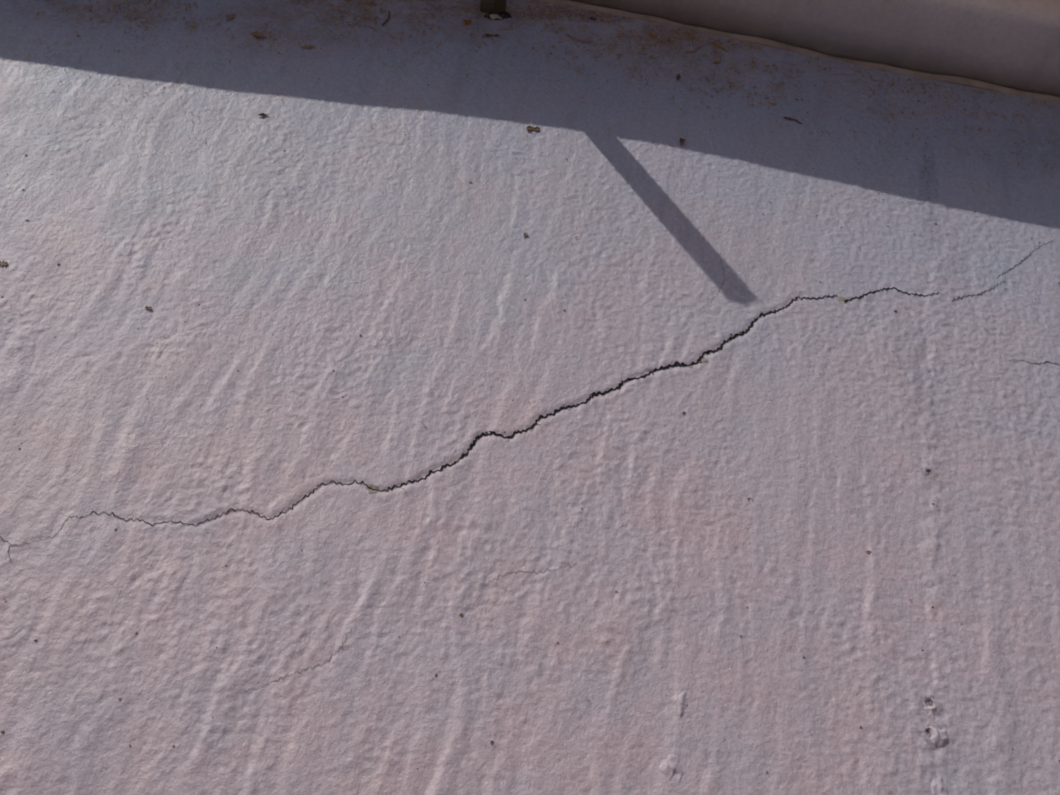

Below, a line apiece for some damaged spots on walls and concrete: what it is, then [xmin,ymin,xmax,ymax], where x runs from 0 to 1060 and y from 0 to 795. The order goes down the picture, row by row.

crack [0,240,1052,562]